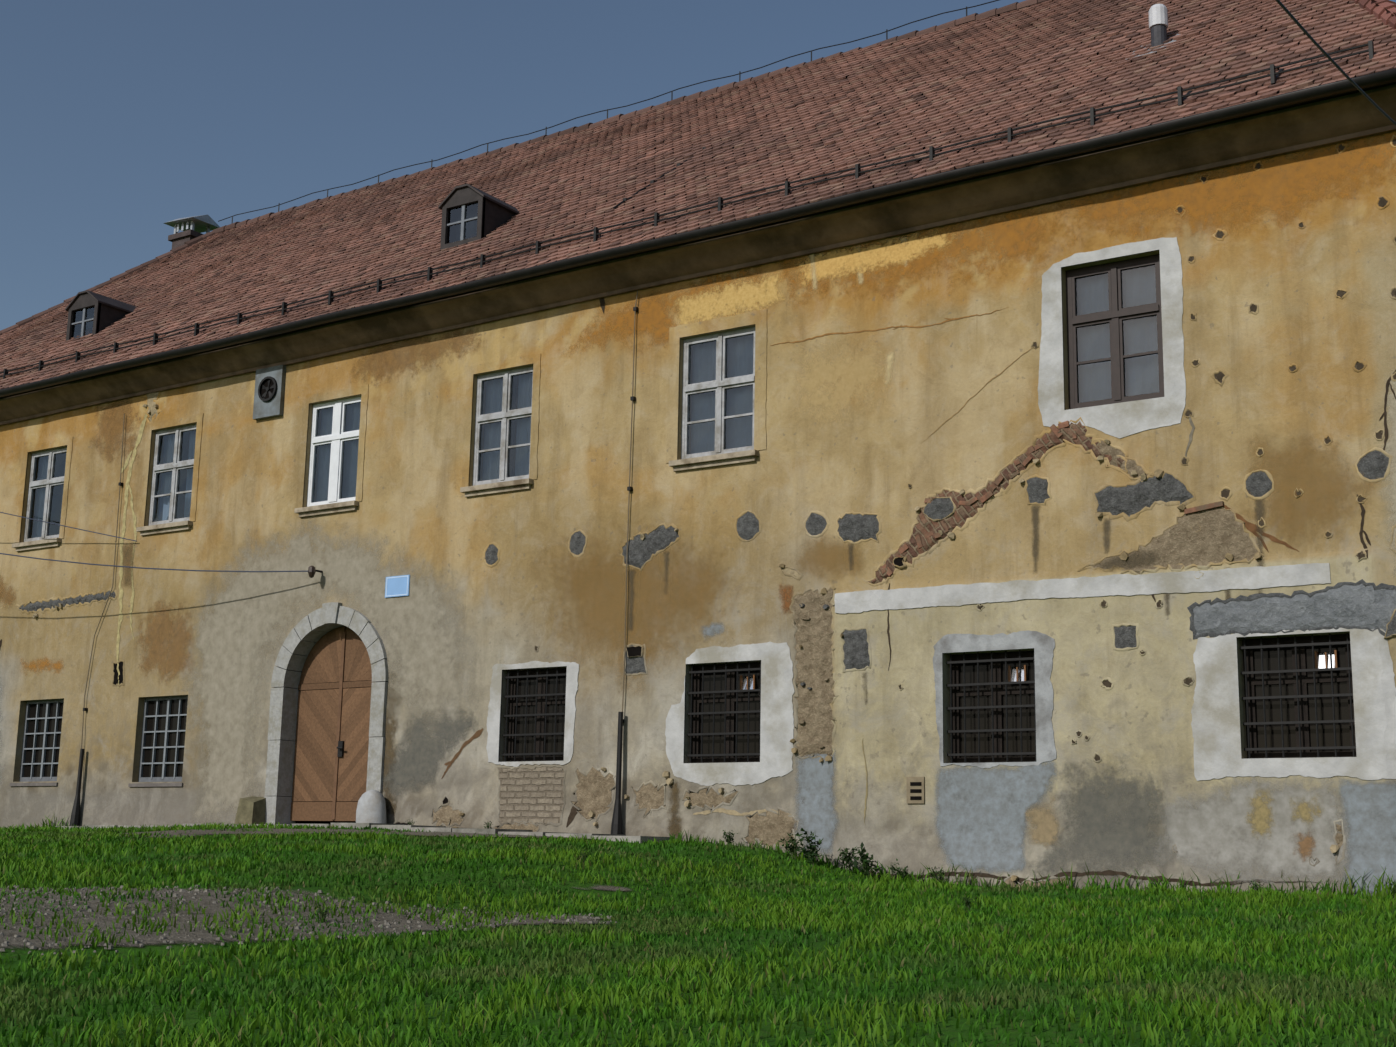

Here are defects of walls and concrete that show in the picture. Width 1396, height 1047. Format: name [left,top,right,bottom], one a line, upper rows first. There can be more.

crack [770,307,1008,346]
crack [924,348,1032,441]
flaking render [803,417,1275,587]
flaking render [779,563,872,763]
damp [383,672,474,817]
damp [1026,767,1166,872]